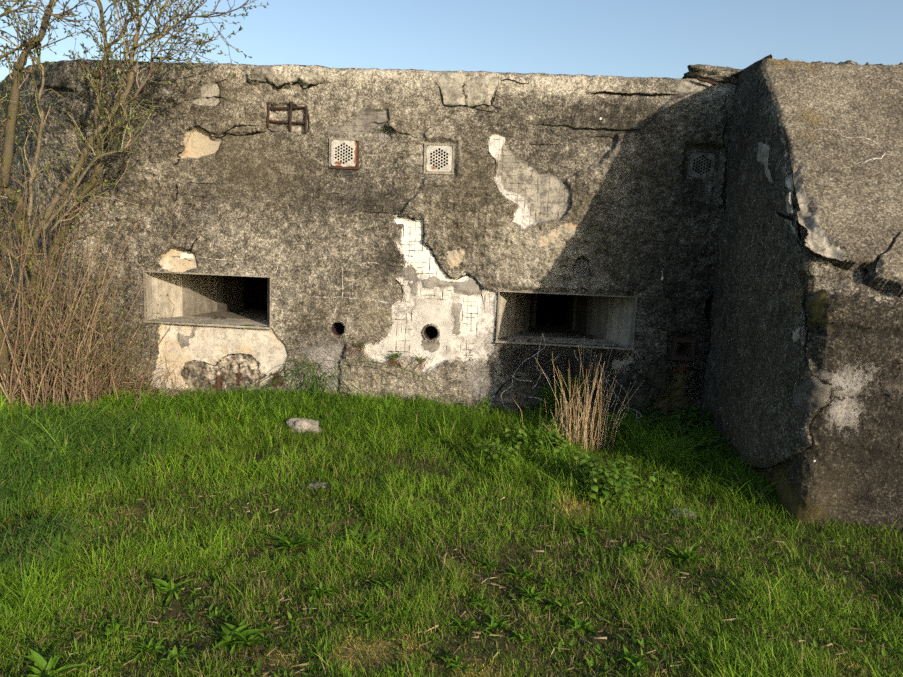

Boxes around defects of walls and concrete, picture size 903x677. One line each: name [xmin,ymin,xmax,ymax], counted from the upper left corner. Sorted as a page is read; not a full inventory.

crack [589,89,675,97]
spalling [178,127,222,159]
peeling [488,134,572,234]
crack [525,124,644,145]
peeling [757,141,774,184]
spalling [782,164,846,261]
spalling [159,247,197,272]
crack [874,229,903,269]
peeling [361,211,498,374]
spalling [151,323,287,395]
crack [742,210,833,470]